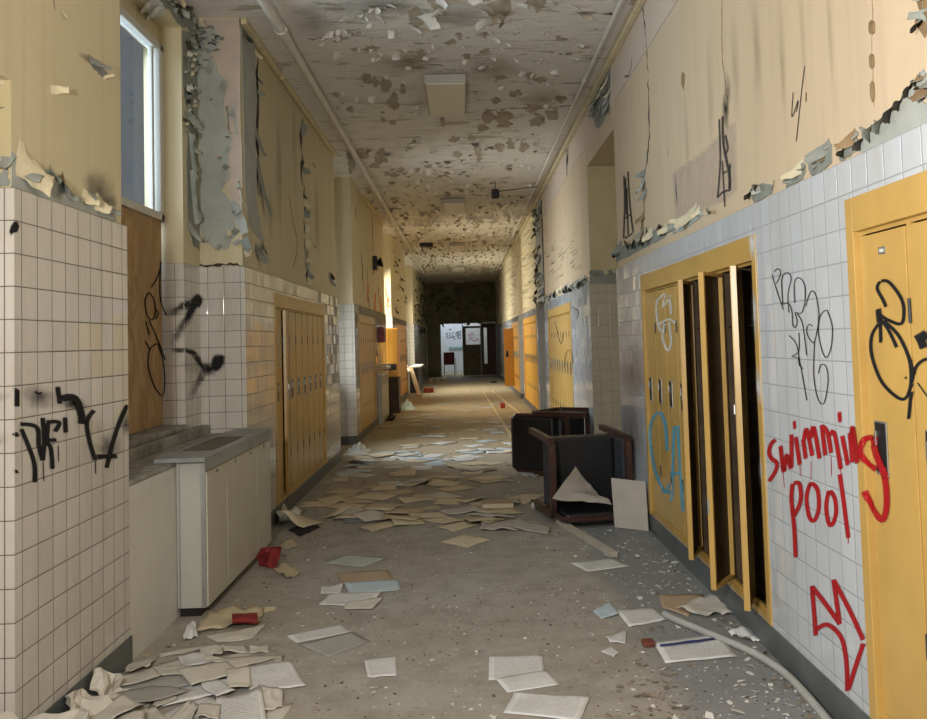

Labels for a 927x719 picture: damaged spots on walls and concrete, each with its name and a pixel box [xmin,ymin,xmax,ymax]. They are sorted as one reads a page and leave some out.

peeling [88,54,115,80]
peeling [140,0,272,267]
peeling [319,0,709,336]
crack [624,7,668,239]
crack [721,6,729,113]
peeling [743,69,927,203]
peeling [907,0,927,38]